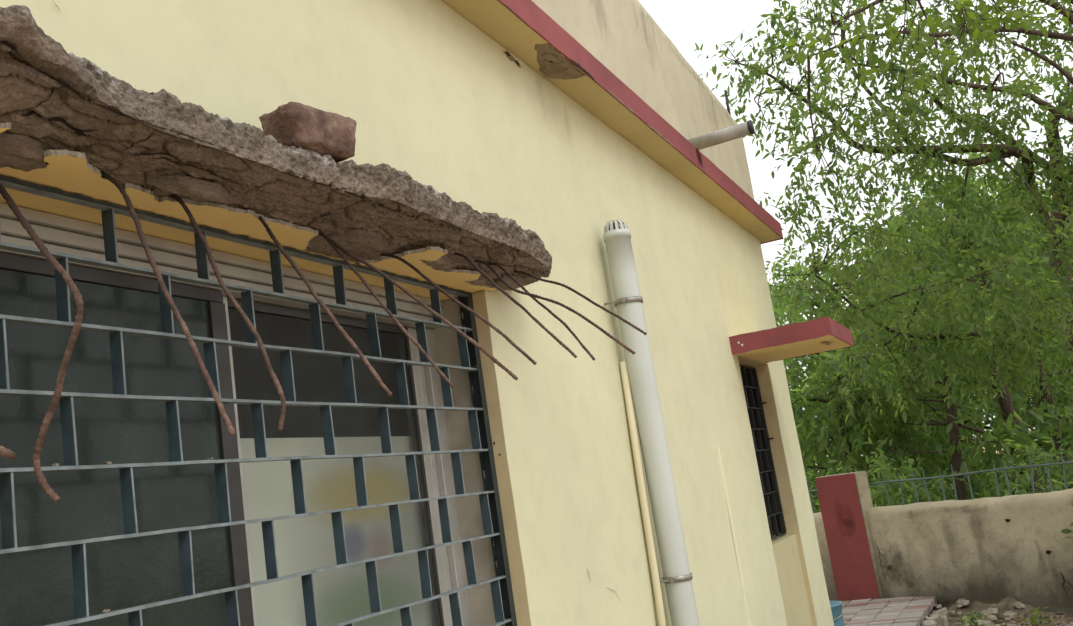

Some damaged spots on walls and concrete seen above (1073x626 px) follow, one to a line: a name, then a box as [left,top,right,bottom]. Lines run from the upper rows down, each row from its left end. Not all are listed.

spalling [0,183,84,503]
crack [6,44,236,183]
spalling [0,43,647,436]
crack [280,172,451,240]